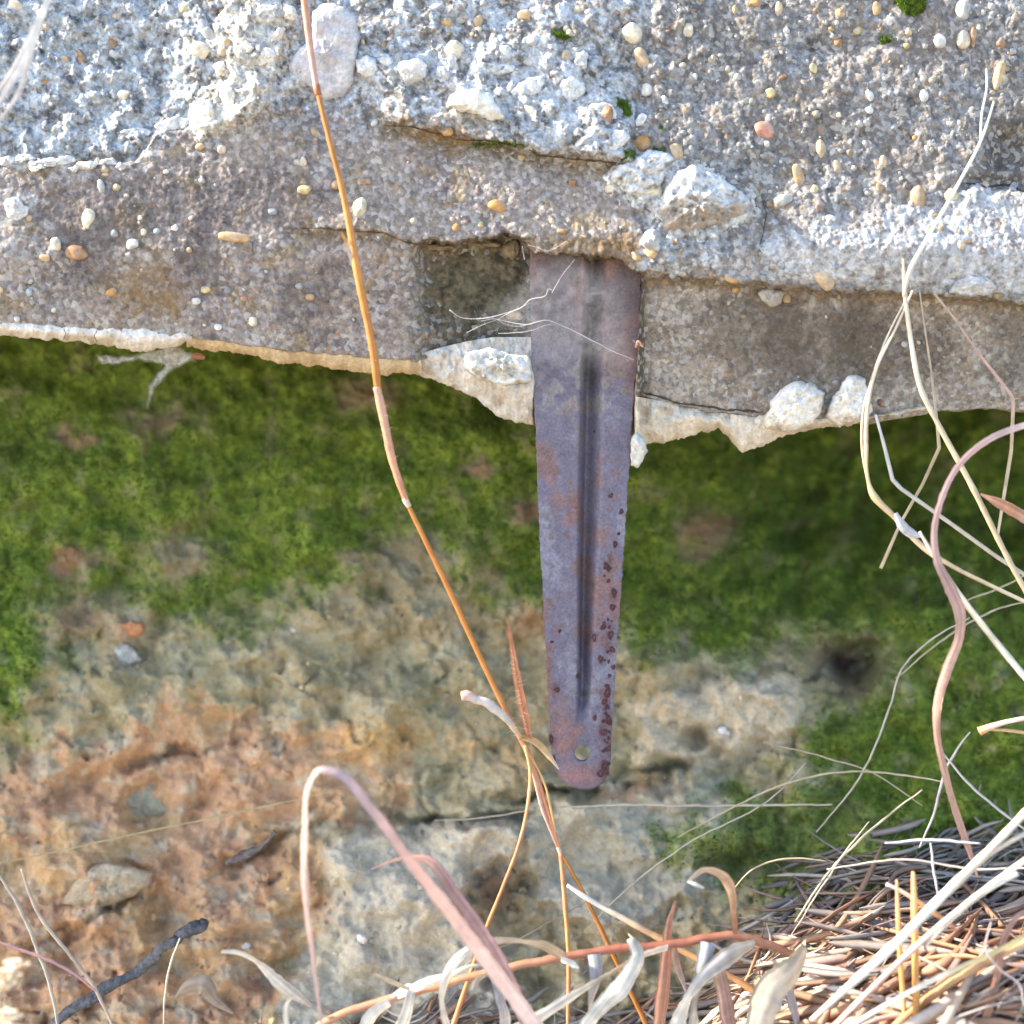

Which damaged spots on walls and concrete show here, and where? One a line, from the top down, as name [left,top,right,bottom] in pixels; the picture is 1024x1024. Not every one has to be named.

crack [294,228,430,245]
spalling [423,236,537,334]
crack [640,392,763,420]
rust [591,562,618,778]